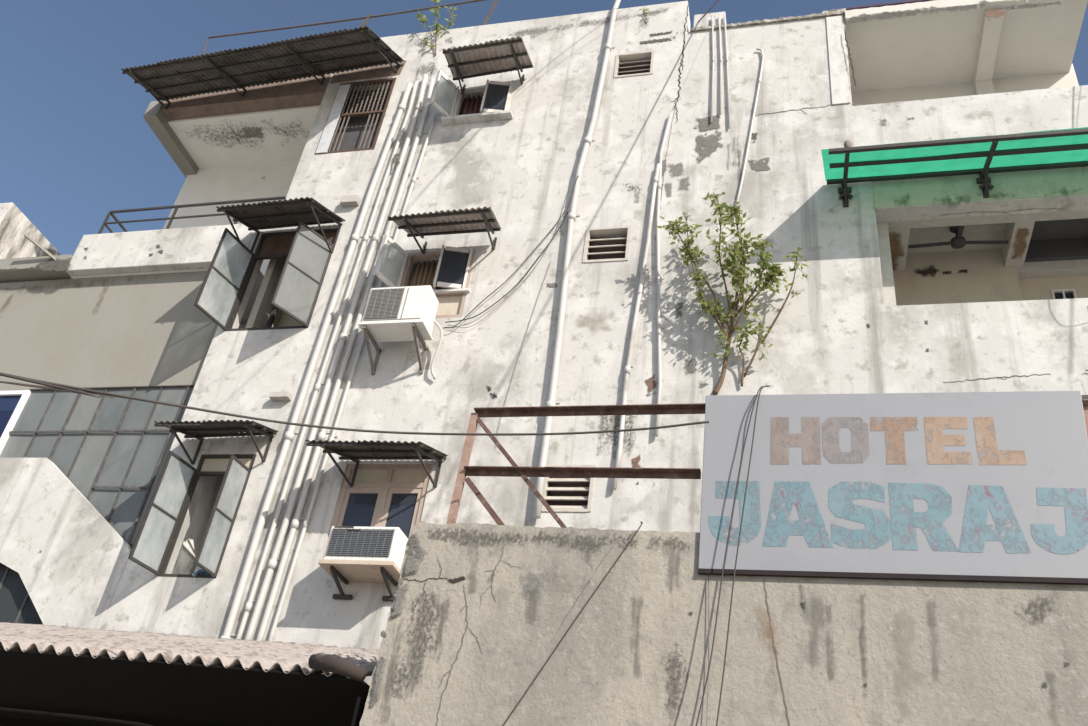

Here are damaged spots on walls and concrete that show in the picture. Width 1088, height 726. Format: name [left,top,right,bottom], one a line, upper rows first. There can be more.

flaking render [848,2,1061,23]
flaking render [694,115,723,163]
water stain [428,528,637,550]
mould [392,592,443,696]
crack [403,535,522,726]
water stain [1026,598,1054,623]
water stain [665,655,688,708]